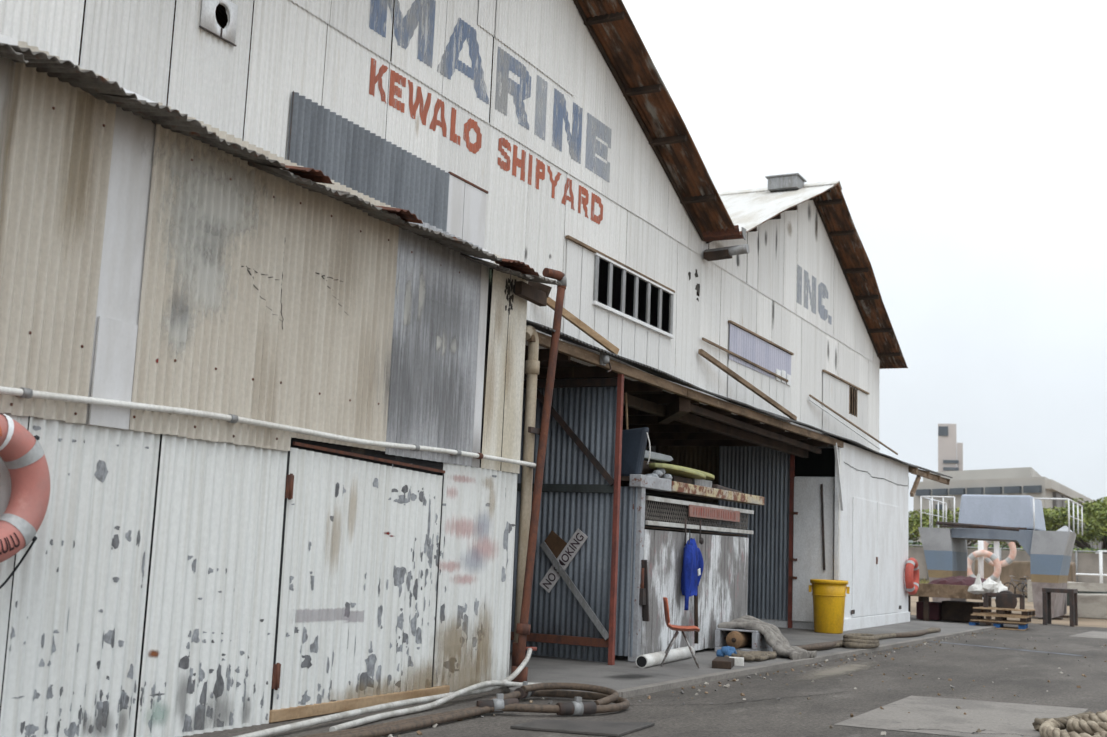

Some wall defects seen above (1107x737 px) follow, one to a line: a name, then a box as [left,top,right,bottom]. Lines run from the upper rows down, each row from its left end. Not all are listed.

damp [165,142,258,351]
peeling [94,460,108,483]
peeling [111,526,145,588]
peeling [188,555,236,574]
peeling [347,485,485,694]
peeling [501,521,516,582]
peeling [39,606,70,667]
peeling [14,628,166,737]
peeling [178,629,268,732]
peeling [277,627,336,705]